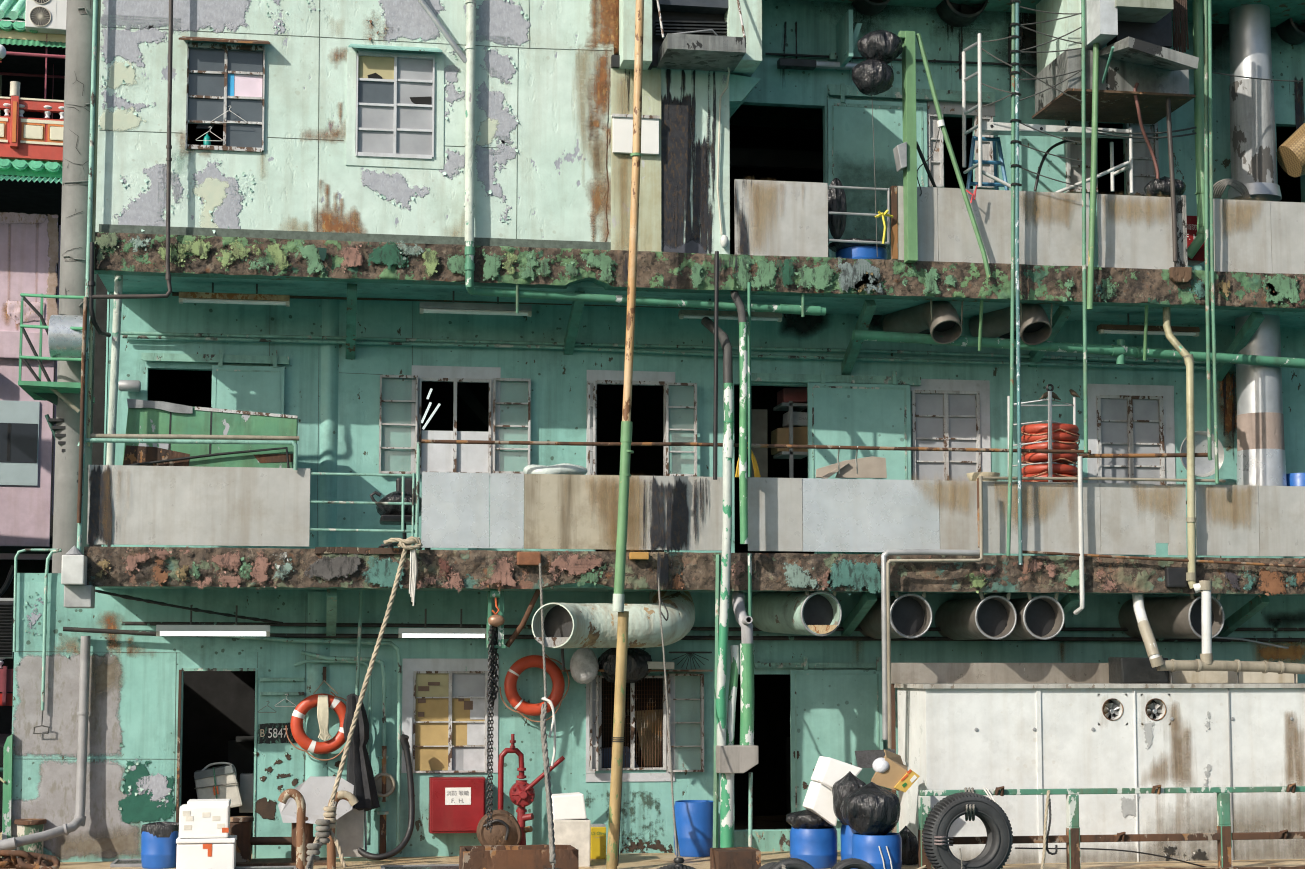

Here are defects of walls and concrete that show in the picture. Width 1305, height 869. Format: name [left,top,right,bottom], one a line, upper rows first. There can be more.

peeling [78,0,287,115]
peeling [46,160,324,326]
corrosion [315,185,362,233]
peeling [340,240,465,277]
peeling [378,0,531,224]
peeling [483,249,614,284]
corrosion [591,182,609,242]
corrosion [588,0,619,161]
damp [666,69,716,235]
peeling [732,256,883,294]
damp [694,478,708,540]
peeling [12,653,176,859]